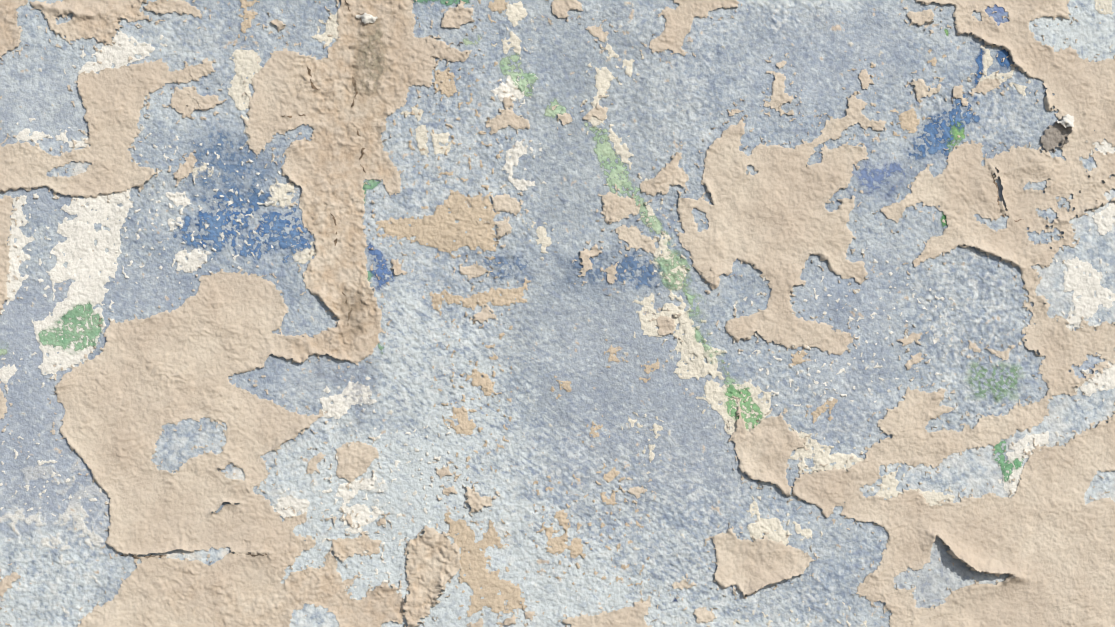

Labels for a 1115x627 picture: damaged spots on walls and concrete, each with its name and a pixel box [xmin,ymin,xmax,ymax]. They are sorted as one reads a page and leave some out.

peeling [501,31,522,55]
peeling [0,0,227,315]
peeling [481,75,531,159]
peeling [48,0,508,627]
peeling [453,184,529,328]
peeling [541,0,1115,627]
peeling [0,563,32,626]
peeling [467,600,544,627]